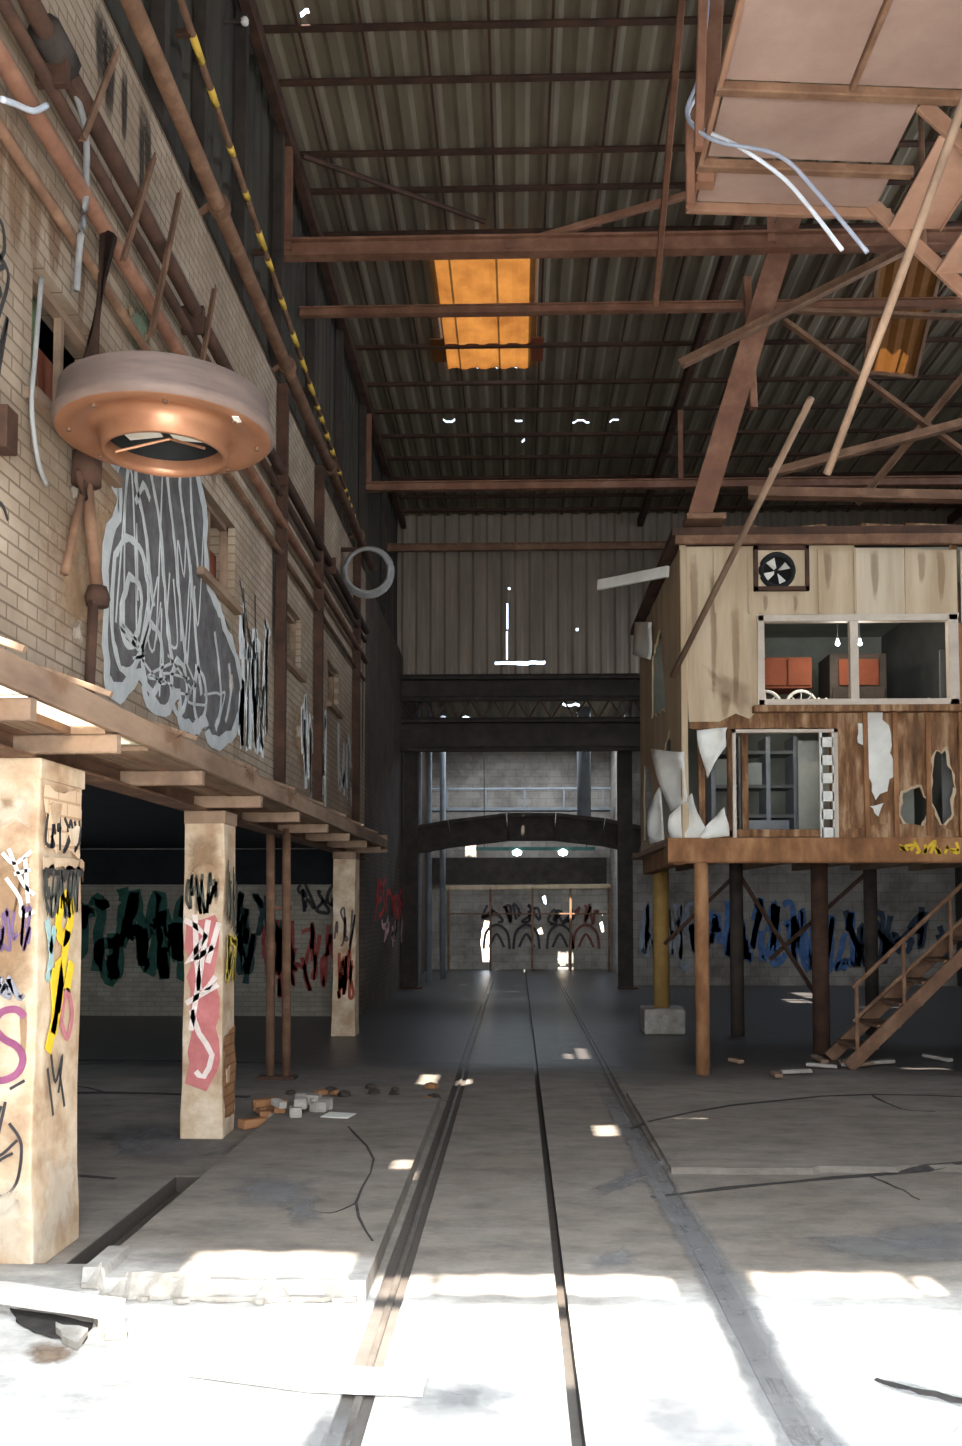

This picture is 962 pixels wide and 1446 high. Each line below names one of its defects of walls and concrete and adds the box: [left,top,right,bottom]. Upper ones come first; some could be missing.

peeling [857,712,893,817]
crack [629,1094,962,1129]
crack [650,1161,962,1200]
damp [809,1223,962,1261]